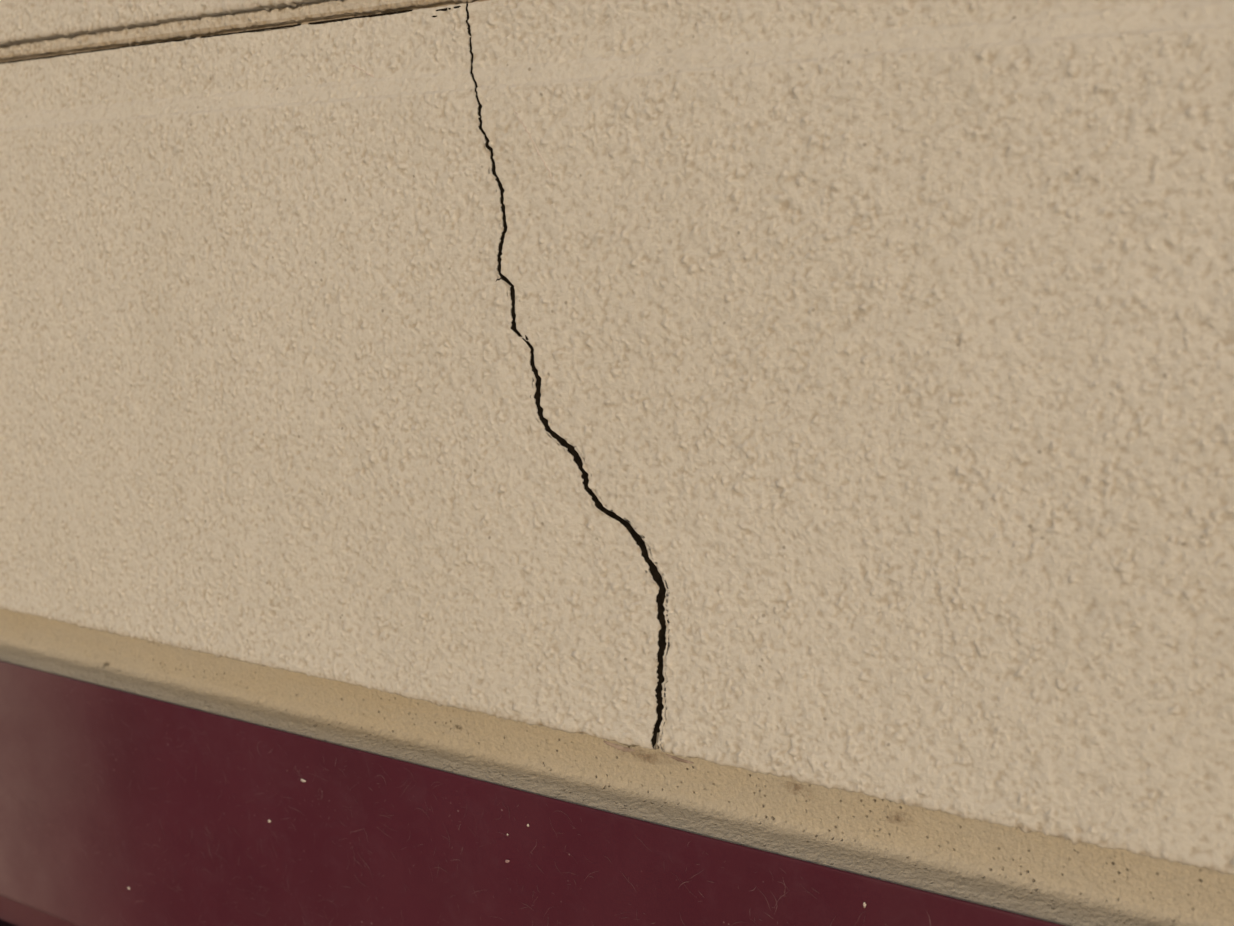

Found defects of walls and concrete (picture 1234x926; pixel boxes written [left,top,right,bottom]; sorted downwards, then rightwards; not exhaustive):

crack [465,4,667,749]